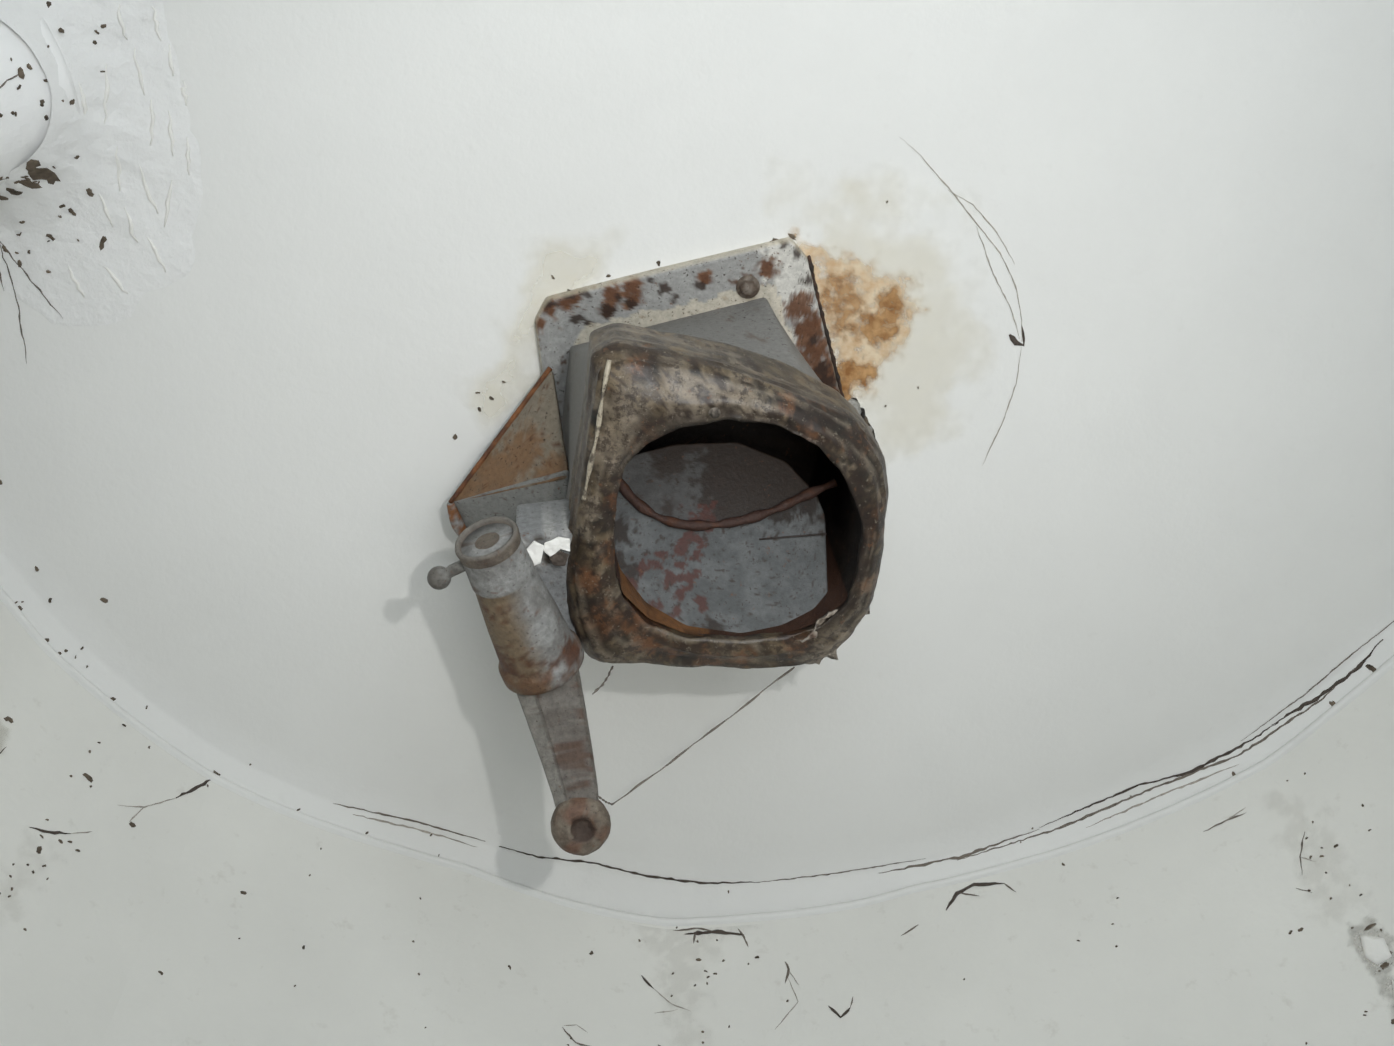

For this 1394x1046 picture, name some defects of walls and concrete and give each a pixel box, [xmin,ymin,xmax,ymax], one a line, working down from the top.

corrosion [800,245,913,401]
crack [901,138,1025,464]
crack [120,779,210,822]
crack [333,621,1394,936]